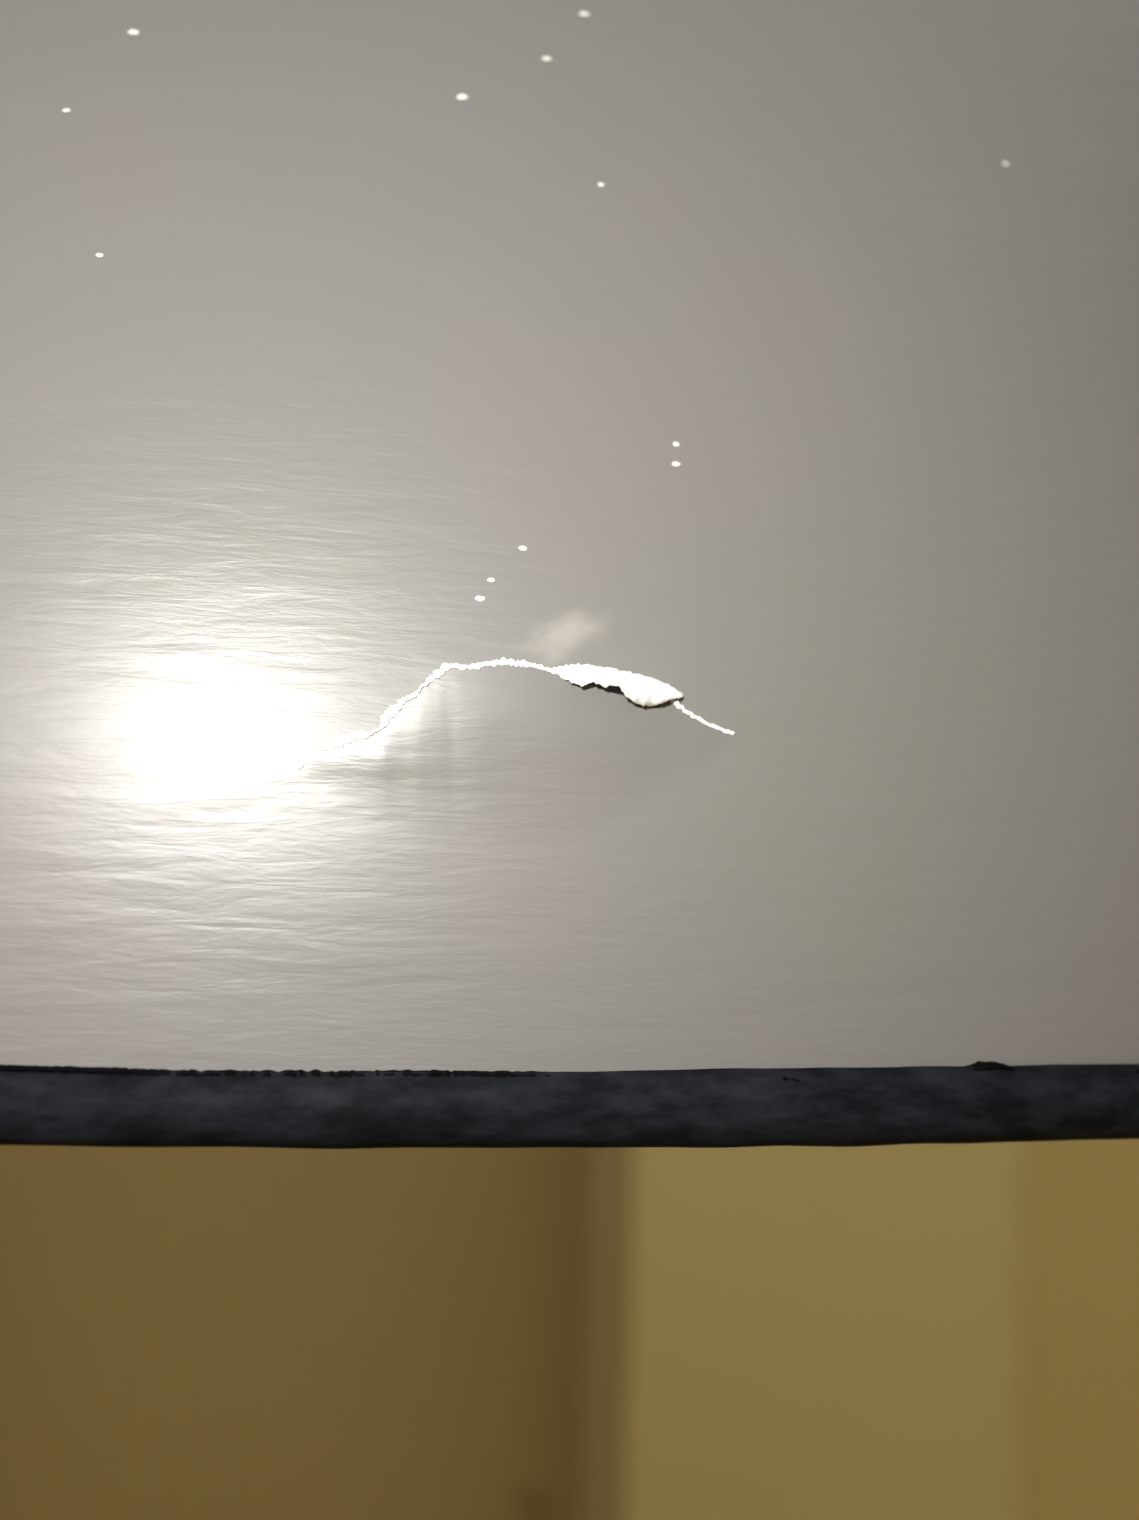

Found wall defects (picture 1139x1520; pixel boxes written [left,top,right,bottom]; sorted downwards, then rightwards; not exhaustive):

crack [297,657,735,770]